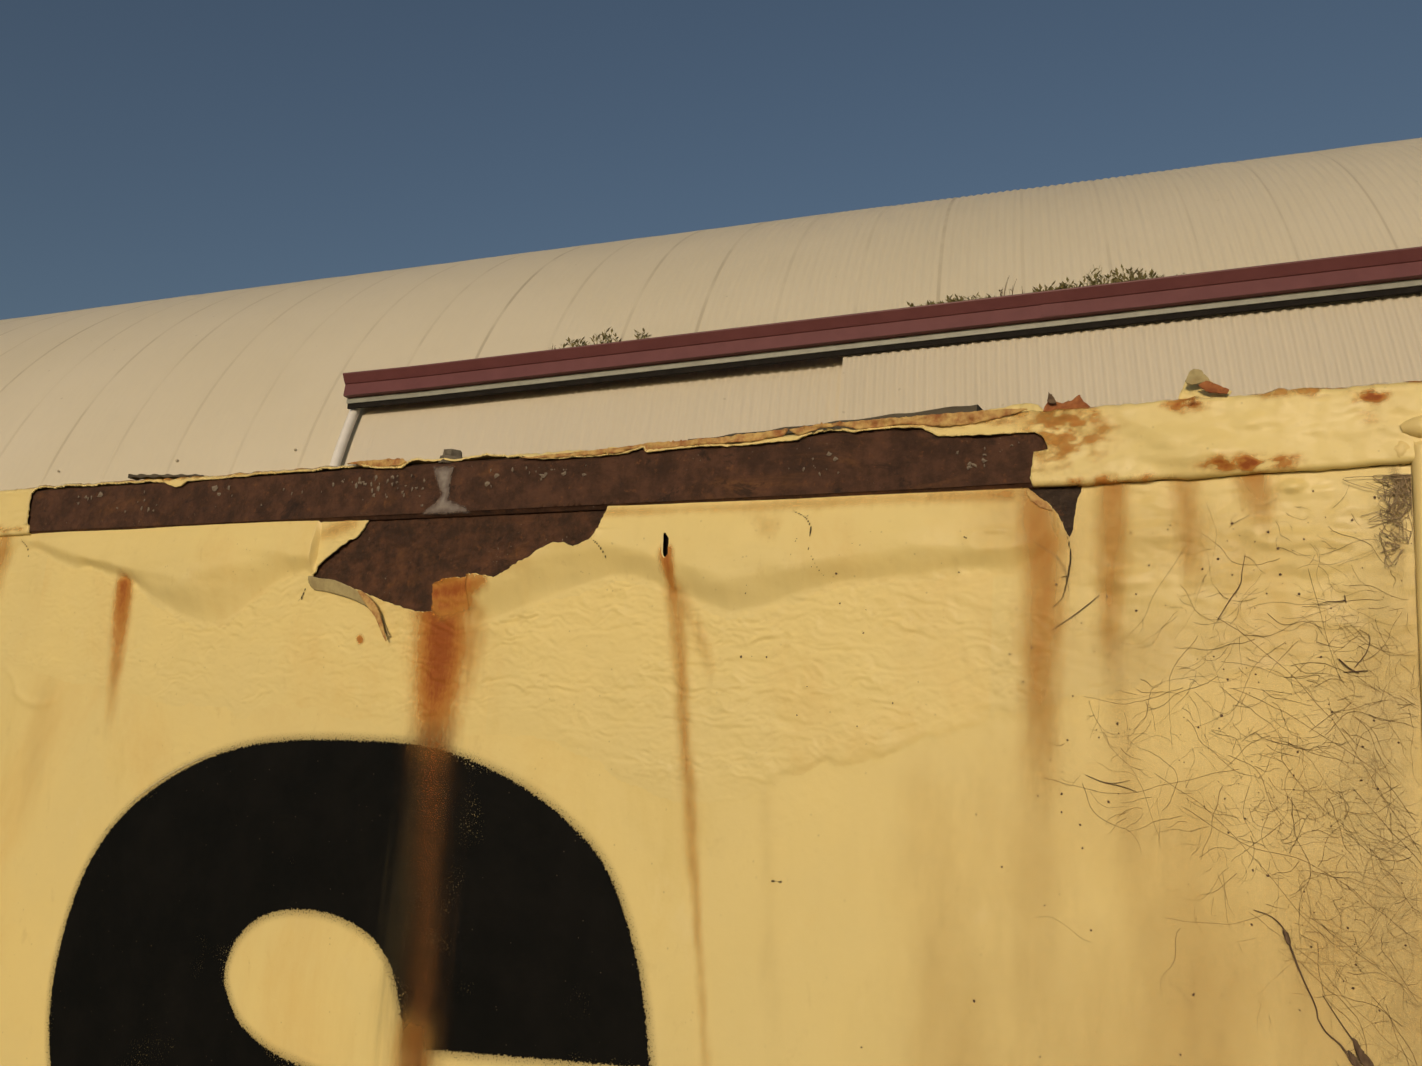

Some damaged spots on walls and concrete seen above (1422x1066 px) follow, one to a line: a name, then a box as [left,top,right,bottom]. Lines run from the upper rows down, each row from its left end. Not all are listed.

corrosion [1019,409,1109,458]
corrosion [1166,396,1201,410]
corrosion [1262,388,1319,396]
corrosion [1360,389,1387,403]
peeling [28,392,1090,641]
corrosion [113,576,131,654]
corrosion [416,574,485,747]
corrosion [660,546,684,701]
corrosion [993,488,1058,705]
corrosion [401,1023,427,1066]